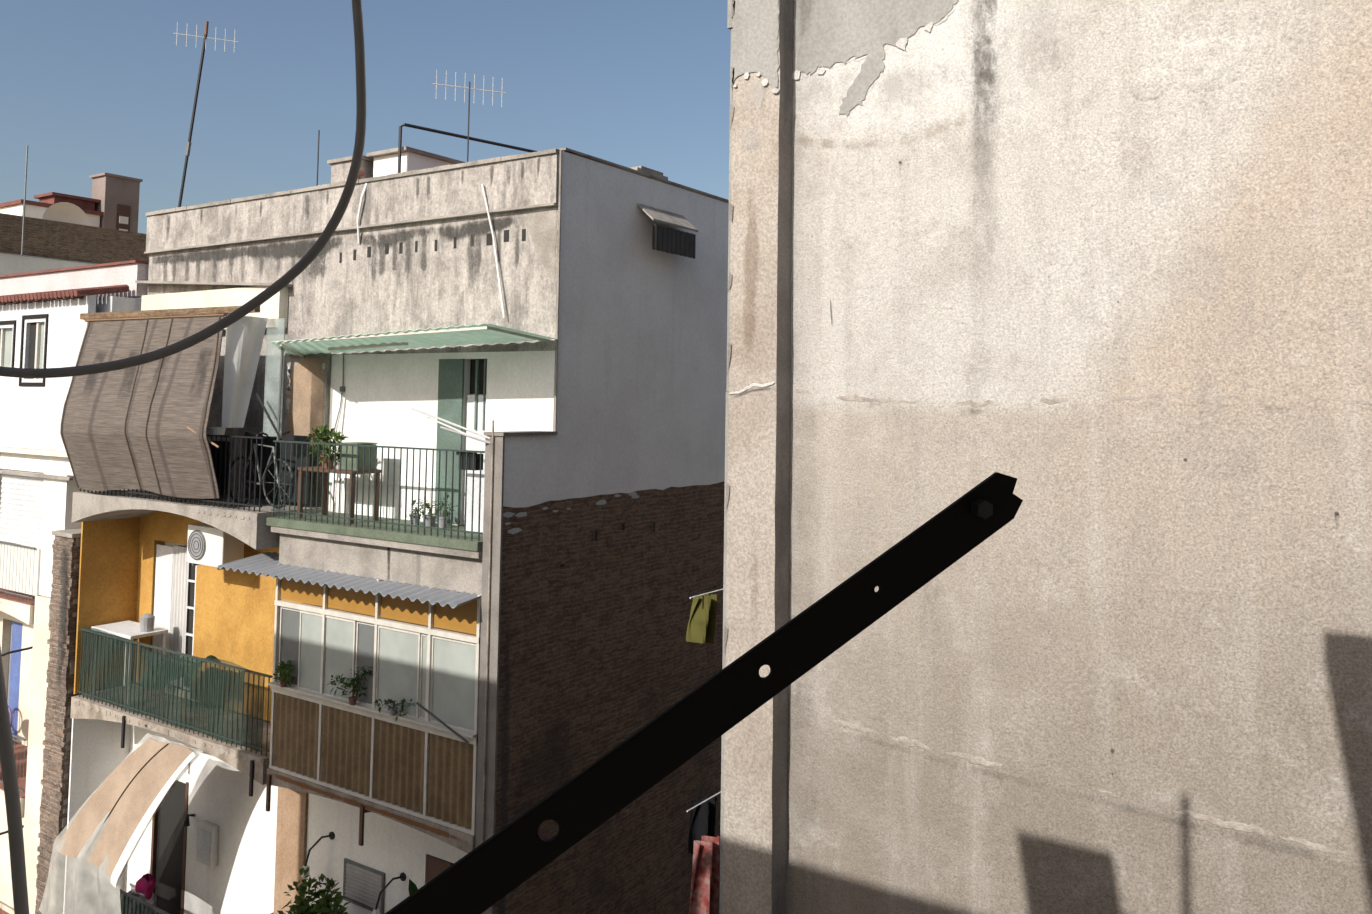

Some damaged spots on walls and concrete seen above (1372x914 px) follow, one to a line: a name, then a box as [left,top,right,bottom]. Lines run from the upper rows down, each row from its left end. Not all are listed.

flaking render [730,0,958,118]
leakage [154,237,341,282]
leakage [360,217,518,276]
crack [832,719,1002,768]
crack [1167,809,1372,863]